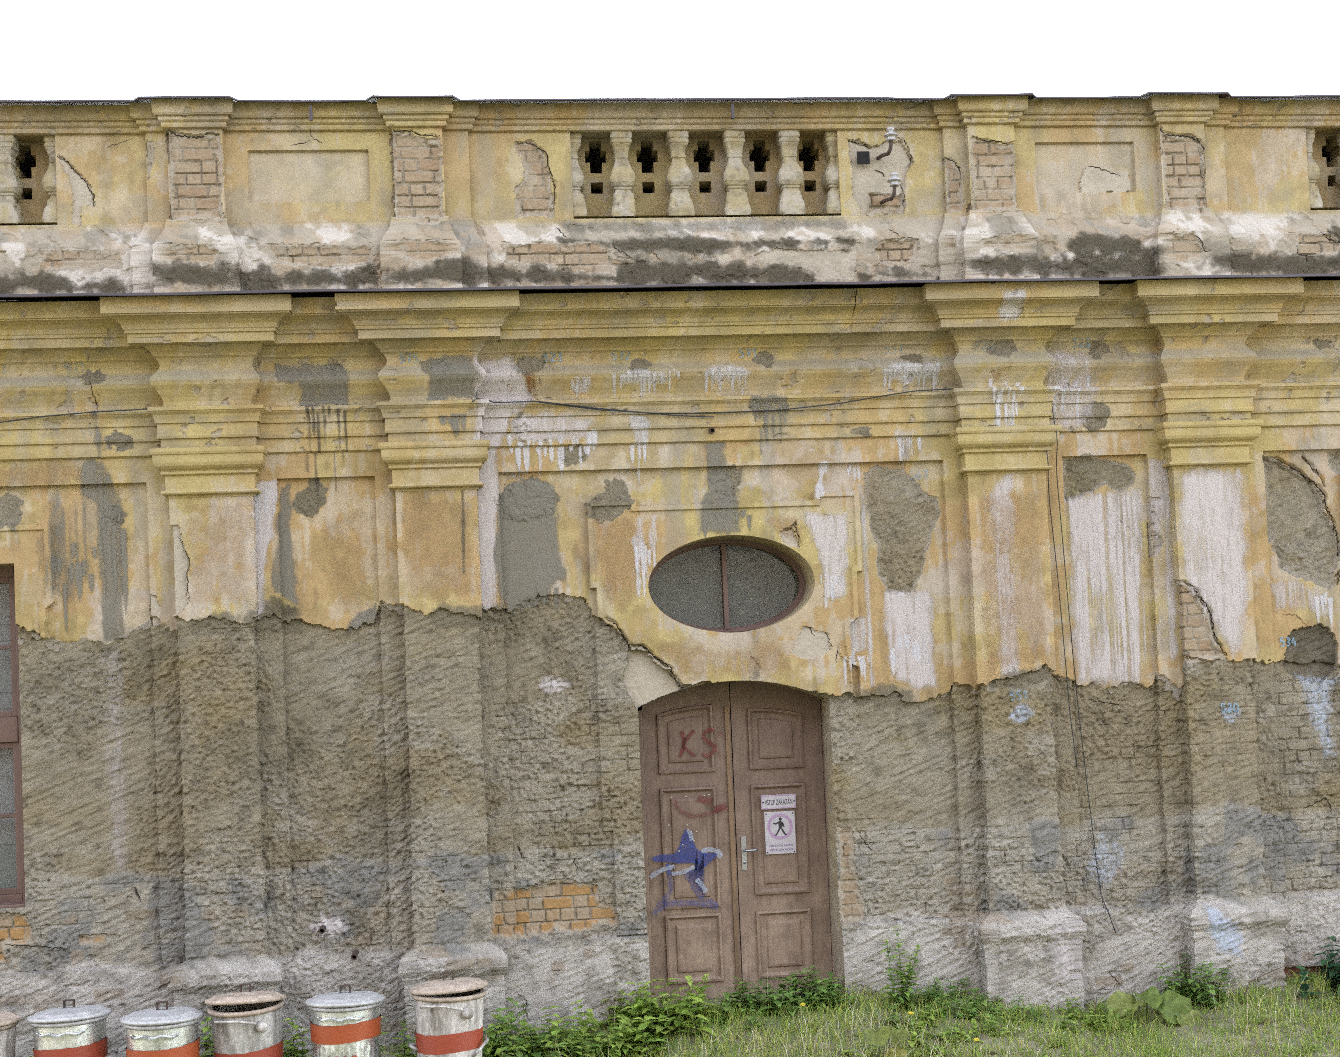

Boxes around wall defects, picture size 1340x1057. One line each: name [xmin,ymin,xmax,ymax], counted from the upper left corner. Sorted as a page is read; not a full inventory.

spalling [146,129,225,228]
flaking render [169,243,218,266]
spalling [390,131,445,264]
spalling [1160,128,1209,215]
water stain [46,412,128,641]
spalling [864,465,940,595]
spalling [1063,454,1135,503]
spalling [1262,456,1340,589]
crack [607,619,683,689]
crack [1184,582,1227,656]
spalling [0,526,709,1057]
spalling [812,580,1340,1011]